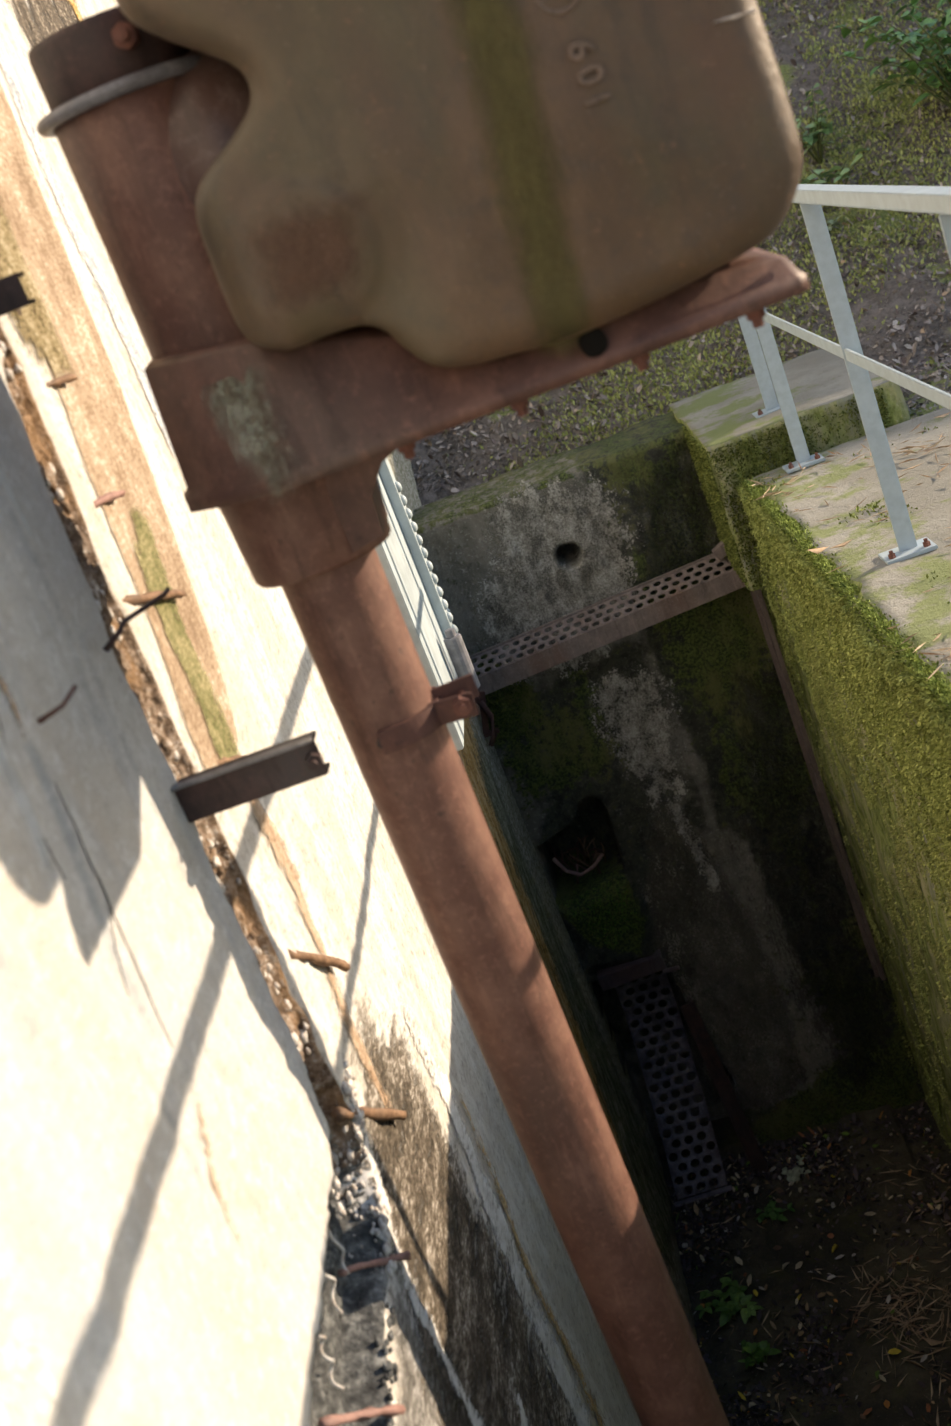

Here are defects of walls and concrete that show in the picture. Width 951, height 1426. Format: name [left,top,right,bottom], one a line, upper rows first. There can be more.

corrosion [0,84,238,769]
leakage [470,438,732,664]
crack [44,782,174,1048]
corrosion [251,799,393,1108]
leakage [516,642,904,1125]
leakage [332,999,591,1426]